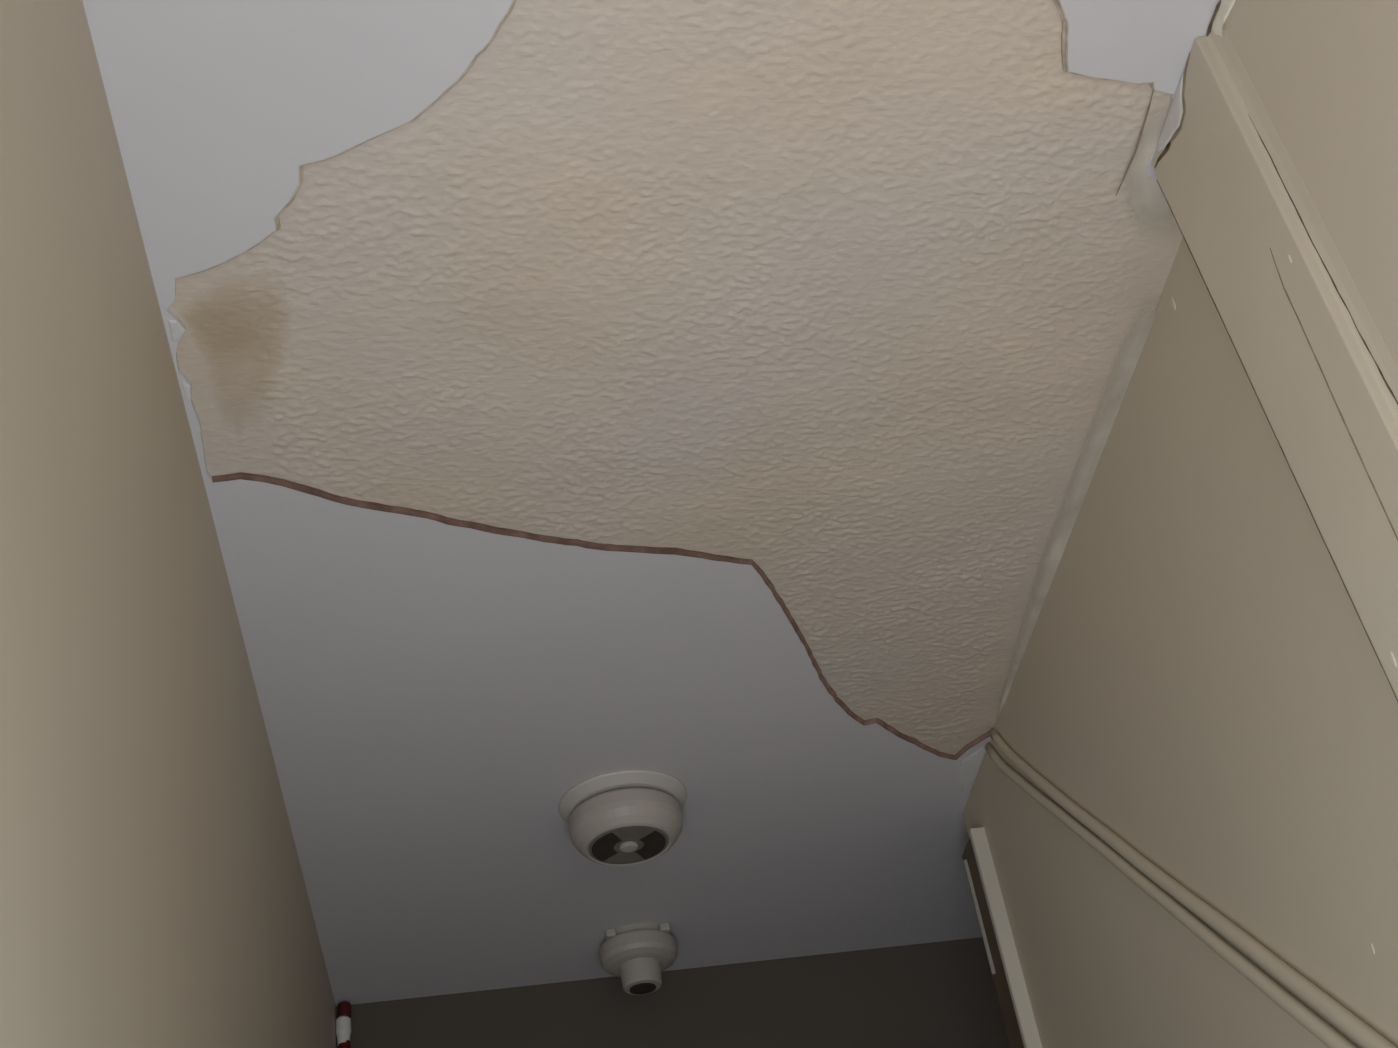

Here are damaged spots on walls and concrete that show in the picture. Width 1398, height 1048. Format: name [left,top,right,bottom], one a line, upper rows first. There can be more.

peeling [168,0,1184,760]